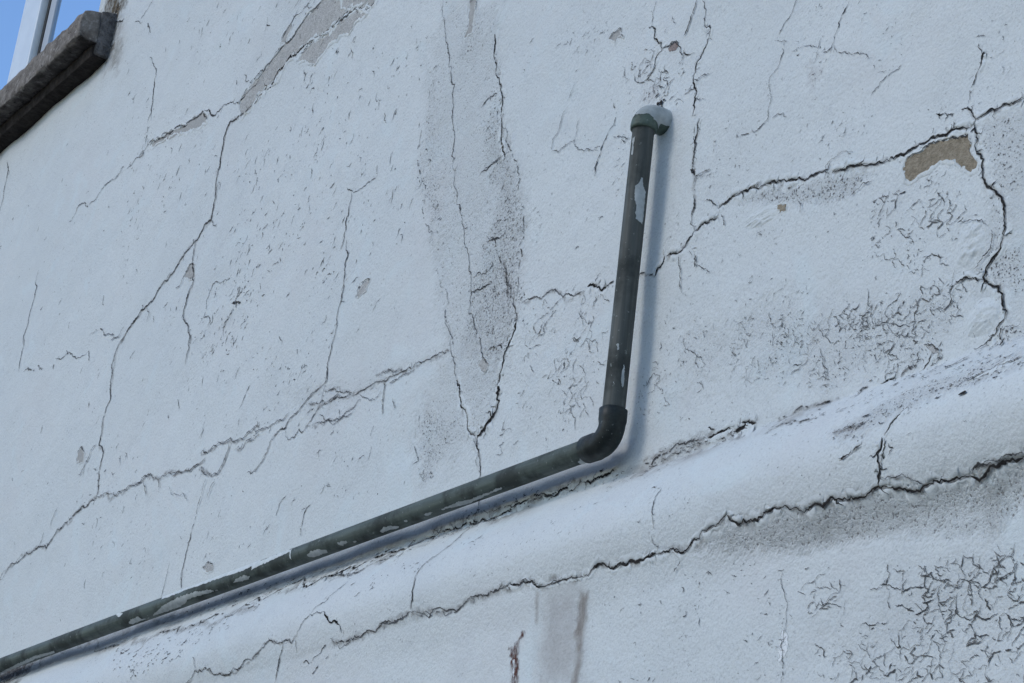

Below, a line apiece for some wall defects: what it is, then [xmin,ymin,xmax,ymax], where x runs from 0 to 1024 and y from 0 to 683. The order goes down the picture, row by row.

peeling [236,0,378,121]
peeling [190,149,318,362]
crack [3,0,613,597]
crack [623,0,1024,465]
peeling [900,115,1024,236]
crack [160,406,1024,683]
corrosion [508,632,523,683]